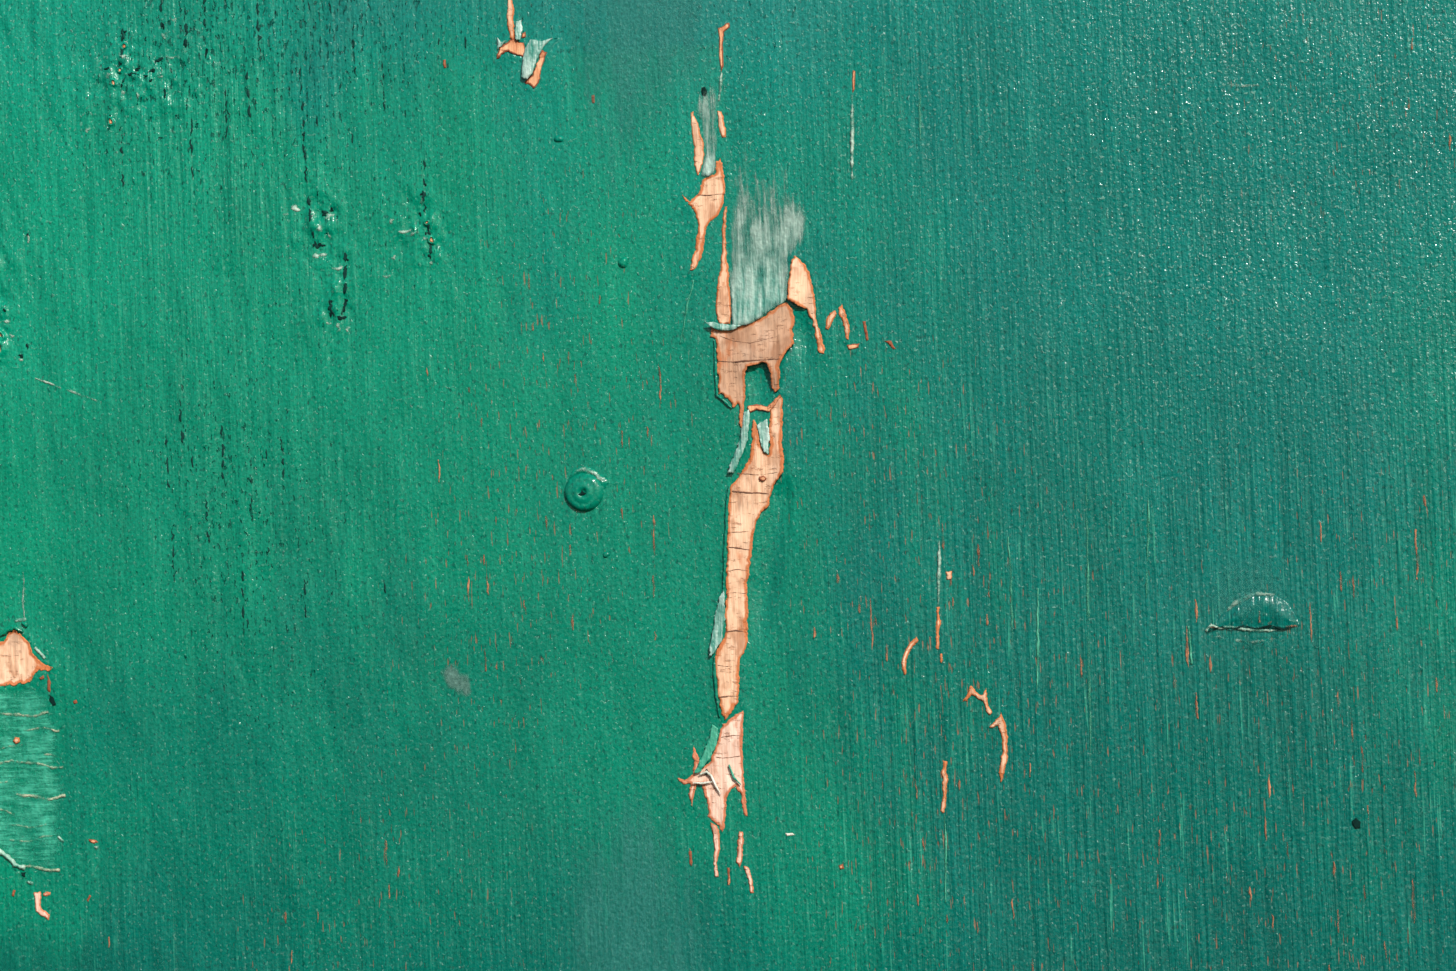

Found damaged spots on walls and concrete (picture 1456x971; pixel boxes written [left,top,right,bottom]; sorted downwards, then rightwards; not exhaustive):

peeling [496,0,552,88]
peeling [678,99,896,893]
peeling [901,637,919,675]
peeling [0,617,77,920]
peeling [962,686,1008,782]